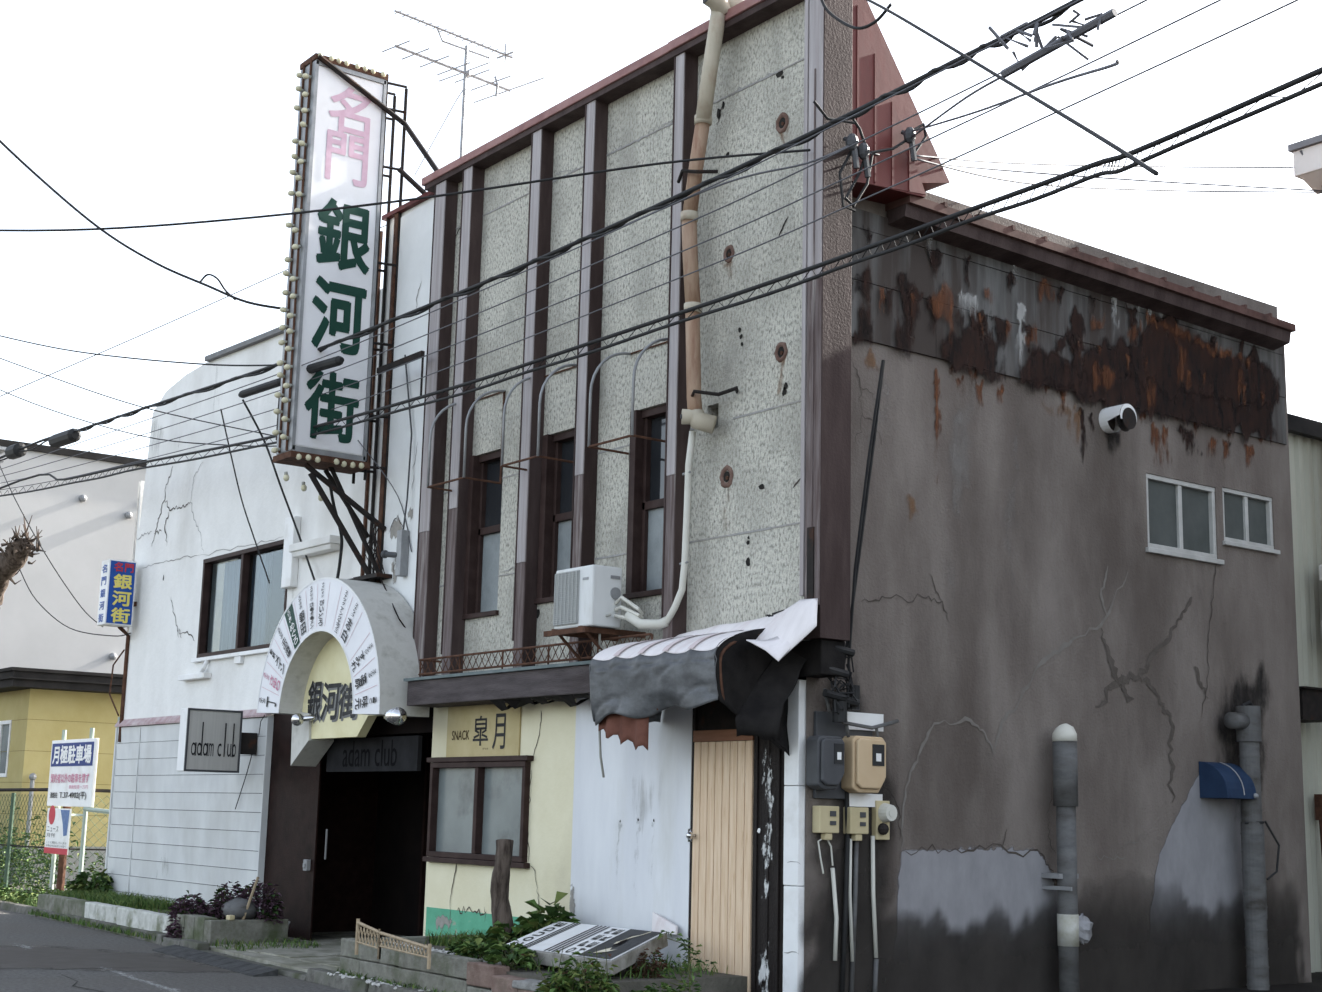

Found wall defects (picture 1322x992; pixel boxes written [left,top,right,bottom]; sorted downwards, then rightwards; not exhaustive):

corrosion [851,247,1280,464]
crack [136,445,280,568]
crack [892,564,1217,882]
damp [1218,665,1267,767]
peeling [758,952,769,992]
peeling [757,749,774,897]
damp [800,778,1059,992]
damp [1078,903,1322,992]